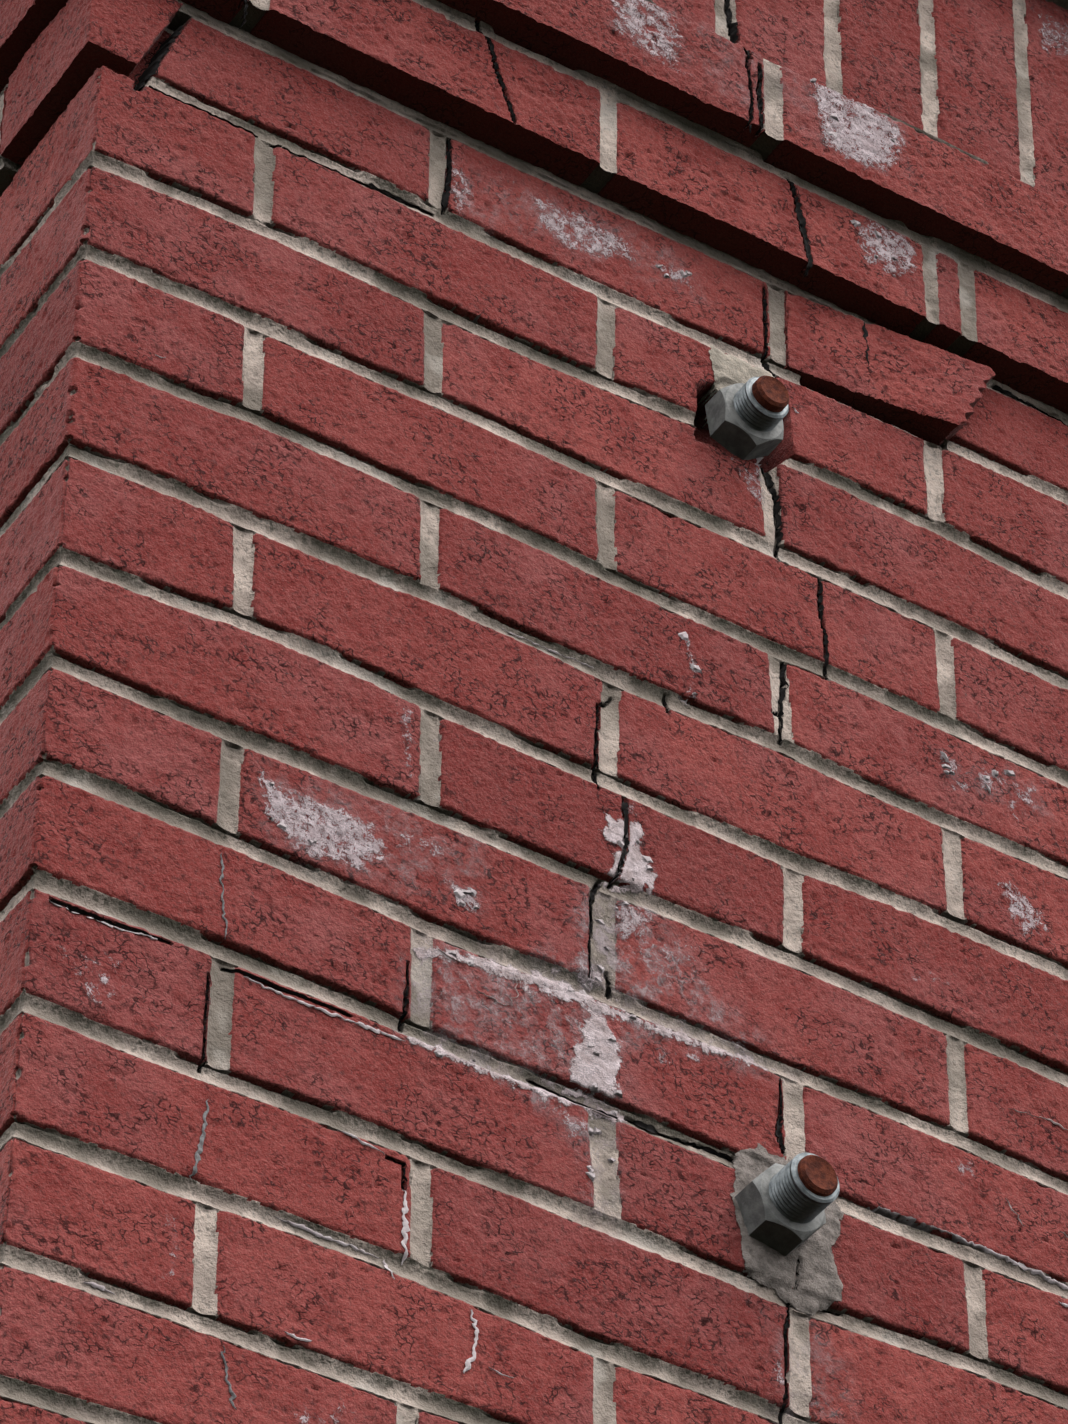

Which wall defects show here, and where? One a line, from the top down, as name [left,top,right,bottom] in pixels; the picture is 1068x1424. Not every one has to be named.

efflorescence [610,0,683,71]
crack [724,0,764,135]
efflorescence [810,78,906,176]
efflorescence [534,197,635,260]
efflorescence [850,220,916,278]
crack [760,468,784,561]
crack [817,579,829,680]
crack [772,662,789,744]
efflorescence [259,771,441,871]
crack [587,699,630,998]
efflorescence [243,805,774,1137]
crack [779,1259,841,1424]